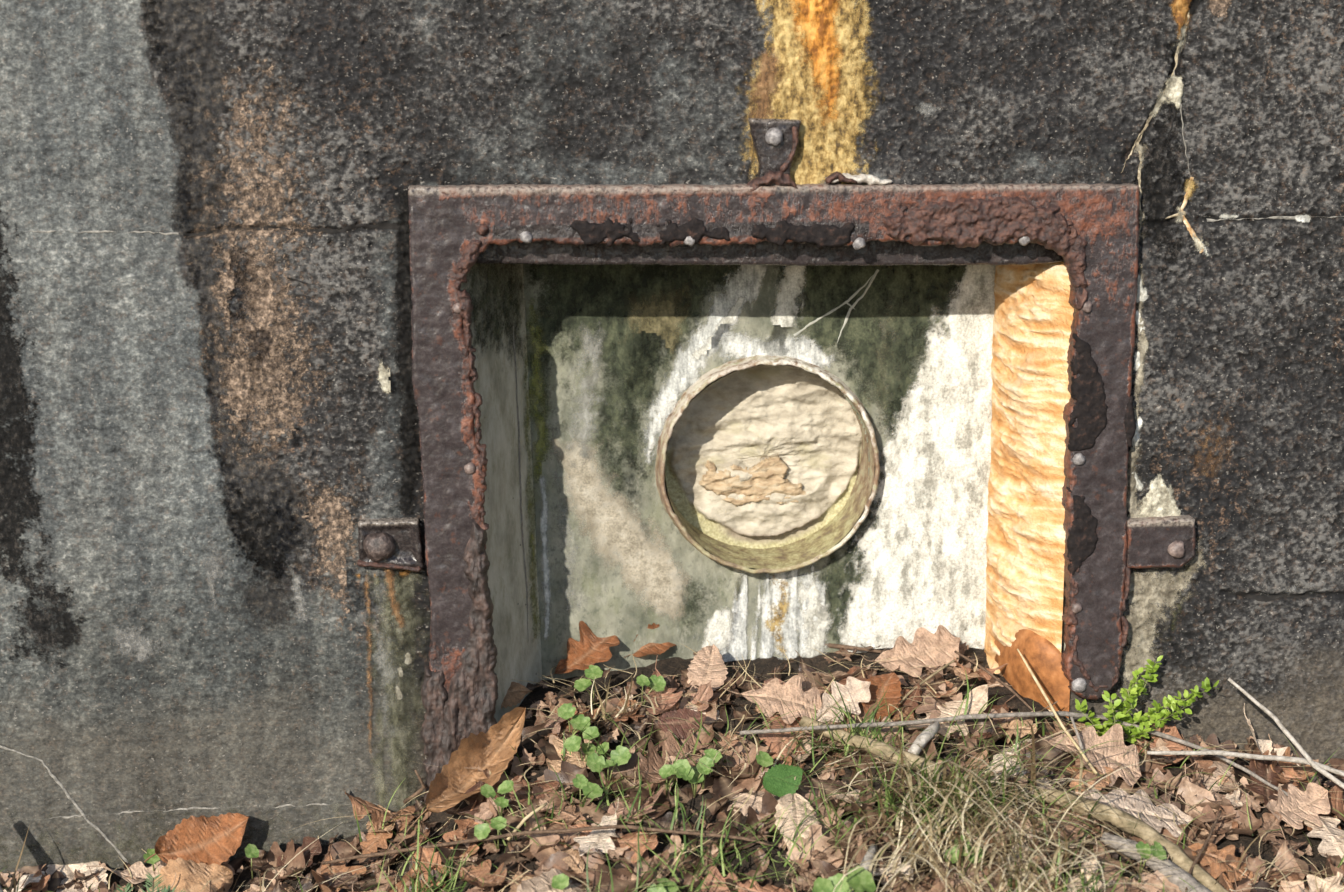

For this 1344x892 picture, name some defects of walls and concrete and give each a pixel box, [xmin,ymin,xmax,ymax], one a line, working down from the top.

water stain [0,205,86,669]
water stain [140,0,313,629]
water stain [394,191,421,516]
corrosion [420,224,498,803]
water stain [467,263,996,662]
corrosion [743,0,877,191]
corrosion [883,196,1088,310]
corrosion [1170,0,1200,35]
crack [1121,11,1344,283]